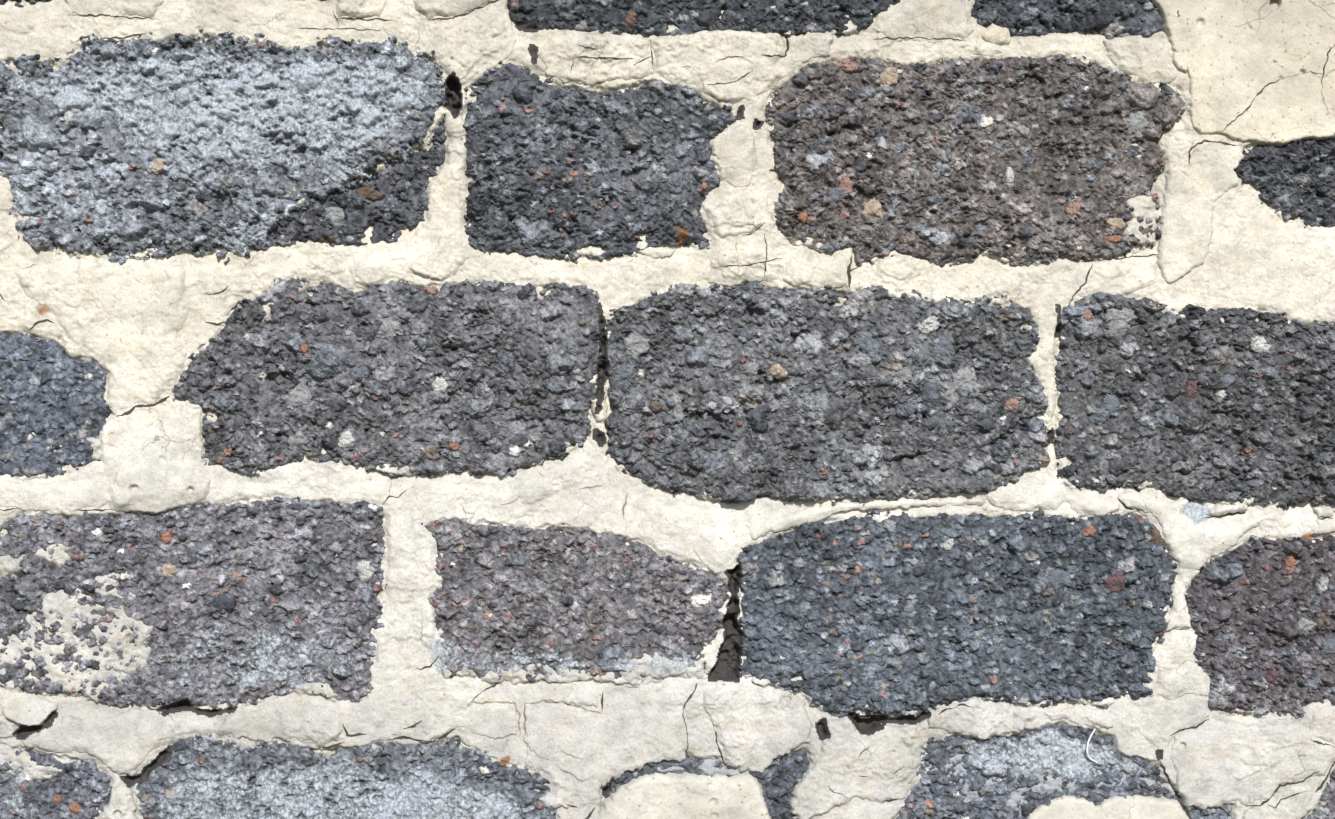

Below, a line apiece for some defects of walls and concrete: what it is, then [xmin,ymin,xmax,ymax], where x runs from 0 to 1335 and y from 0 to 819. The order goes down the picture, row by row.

crack [1188,1,1335,164]
peeling [1069,133,1335,302]
crack [317,681,603,749]
crack [682,683,726,769]
crack [828,748,901,804]
crack [1159,719,1209,819]
crack [1245,740,1335,819]